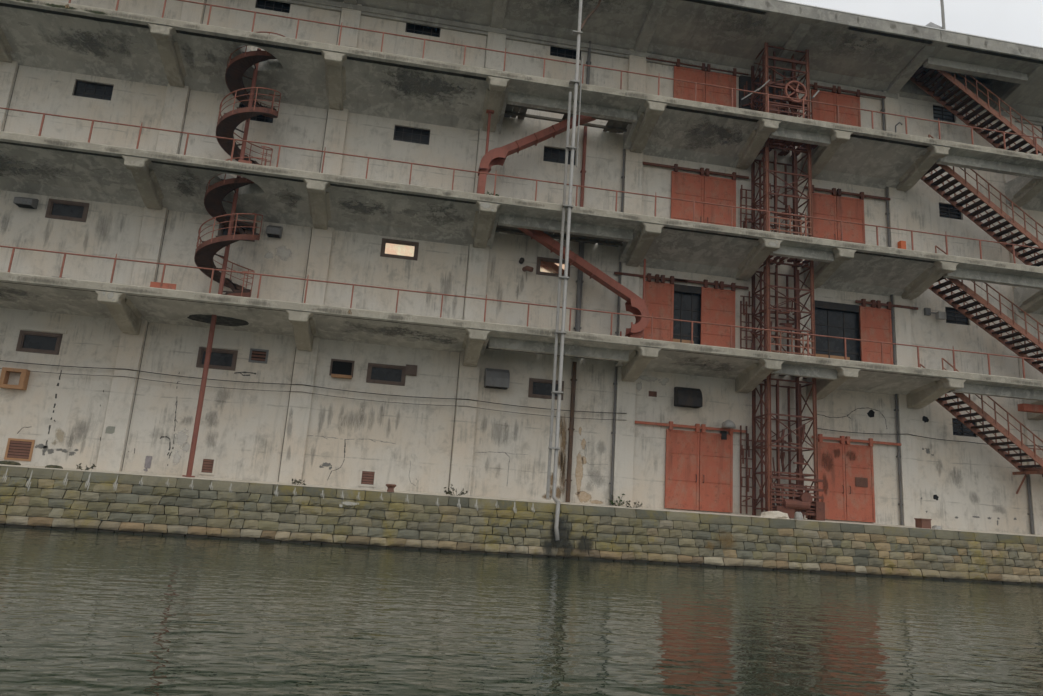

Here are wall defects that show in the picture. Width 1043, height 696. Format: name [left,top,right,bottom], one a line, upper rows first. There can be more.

crack [17,370,62,449]
crack [160,372,180,466]